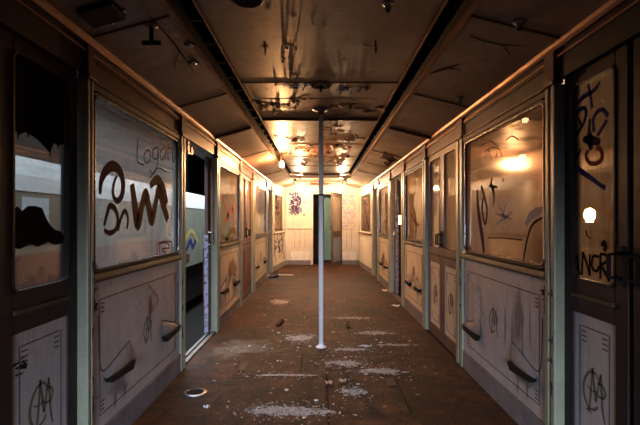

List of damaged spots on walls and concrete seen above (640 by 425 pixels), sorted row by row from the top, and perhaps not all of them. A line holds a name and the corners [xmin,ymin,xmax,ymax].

peeling [252,98,315,115]
peeling [273,125,366,168]